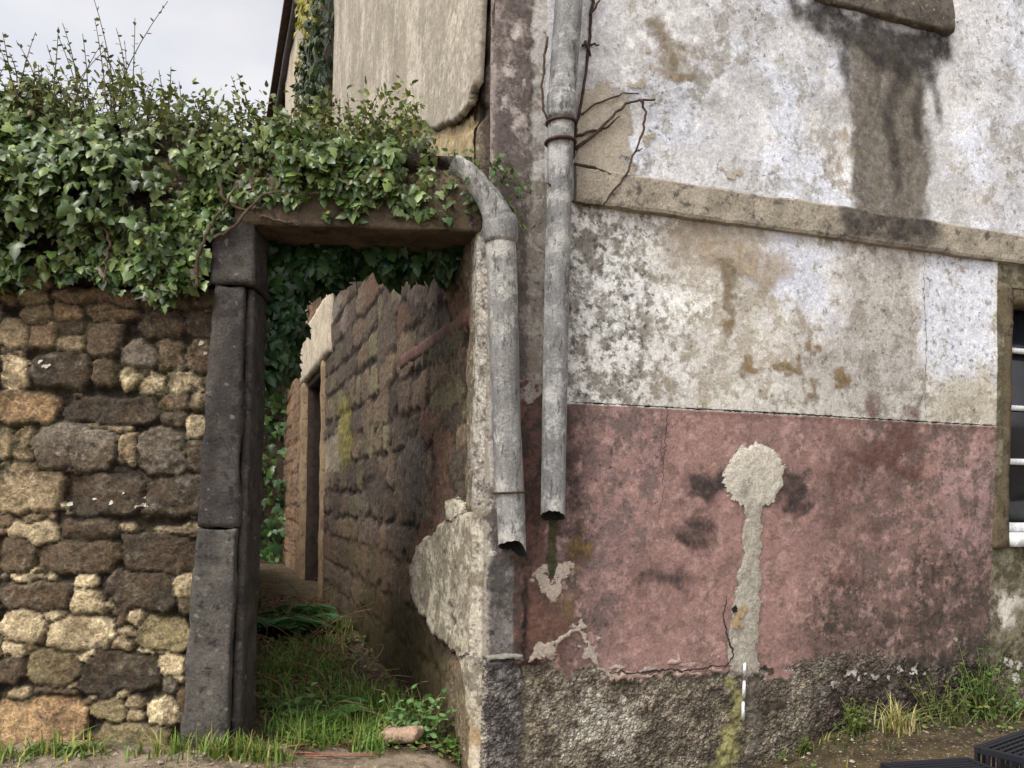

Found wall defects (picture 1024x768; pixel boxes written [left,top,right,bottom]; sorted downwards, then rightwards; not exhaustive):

leakage [842,32,940,242]
flaking render [409,496,723,768]
crack [609,596,734,691]
flaking render [731,605,748,632]
flaking render [756,694,786,737]